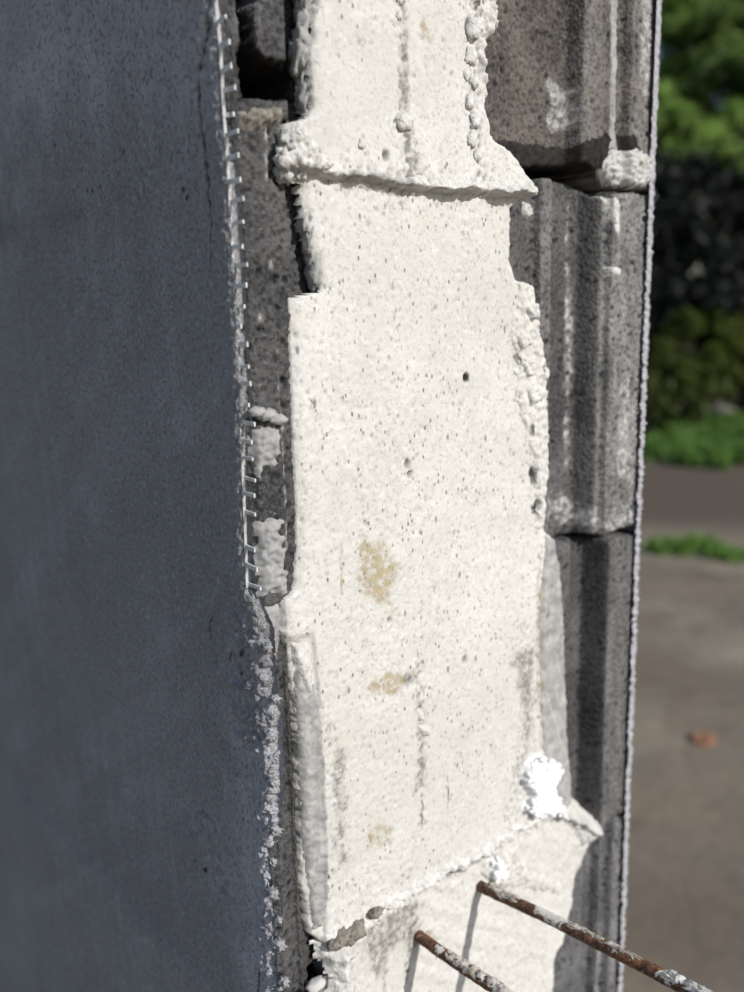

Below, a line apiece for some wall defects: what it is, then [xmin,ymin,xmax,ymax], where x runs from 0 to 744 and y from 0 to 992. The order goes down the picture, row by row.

spalling [234,0,292,104]
spalling [468,0,499,98]
spalling [405,133,418,177]
spalling [495,133,640,180]
spalling [507,282,550,530]
spalling [223,606,282,747]
peeling [290,642,313,693]
flaking render [265,822,284,837]
flaking render [263,884,280,900]
flaking render [268,936,288,952]
flaking render [275,974,291,992]